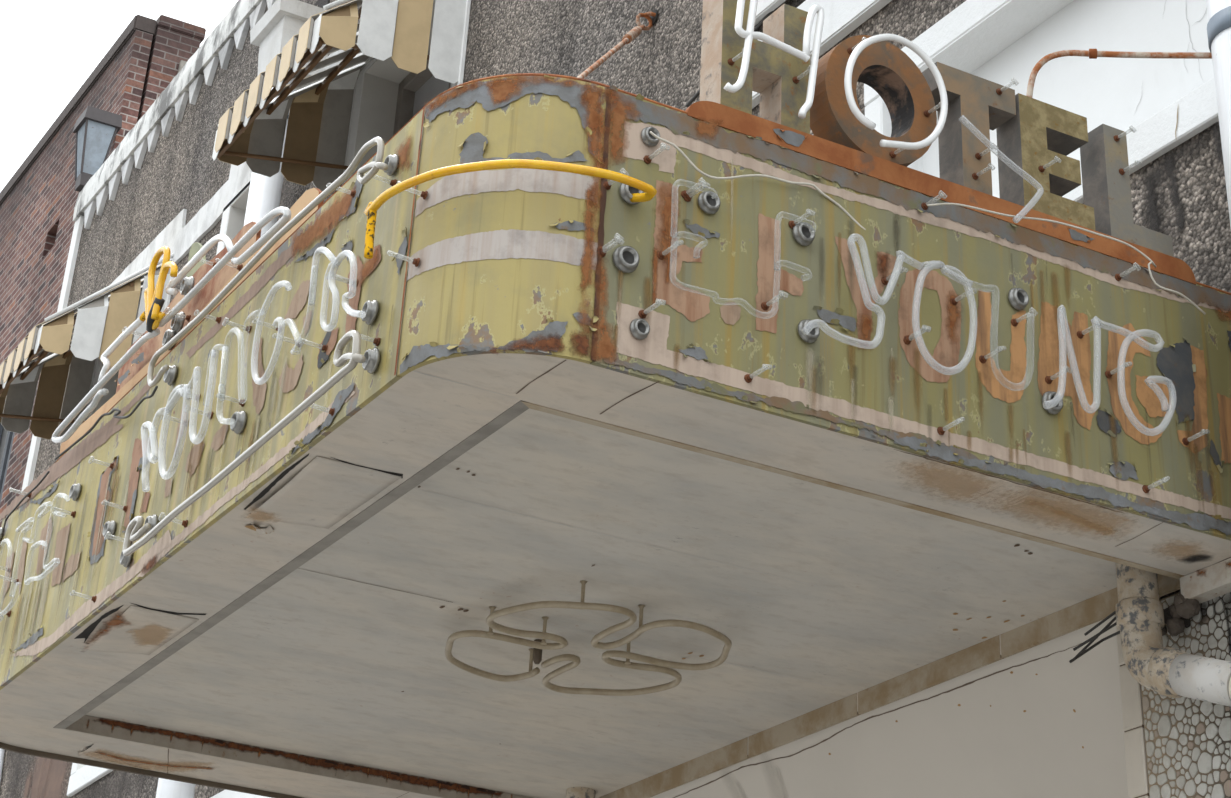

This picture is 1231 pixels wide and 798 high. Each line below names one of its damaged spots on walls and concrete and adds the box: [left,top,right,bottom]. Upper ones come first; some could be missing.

corrosion [426,76,639,361]
peeling [423,75,1231,311]
corrosion [878,254,888,278]
peeling [399,312,599,375]
spalling [1162,592,1201,637]
corrosion [87,718,512,798]
crack [673,643,1081,798]